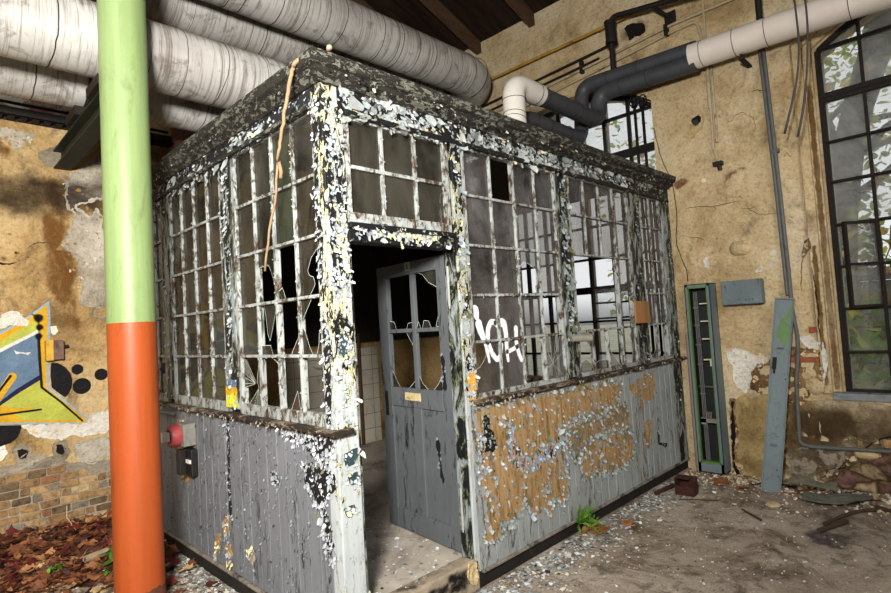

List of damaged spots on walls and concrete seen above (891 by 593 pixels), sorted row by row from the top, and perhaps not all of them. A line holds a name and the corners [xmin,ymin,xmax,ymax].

crack [0,242,56,265]
water stain [44,206,76,305]
flaking render [56,149,106,309]
flaking render [0,311,29,329]
peeling [152,78,714,593]
flaking render [0,410,111,534]
flaking render [726,348,770,476]
flaking render [785,335,891,481]